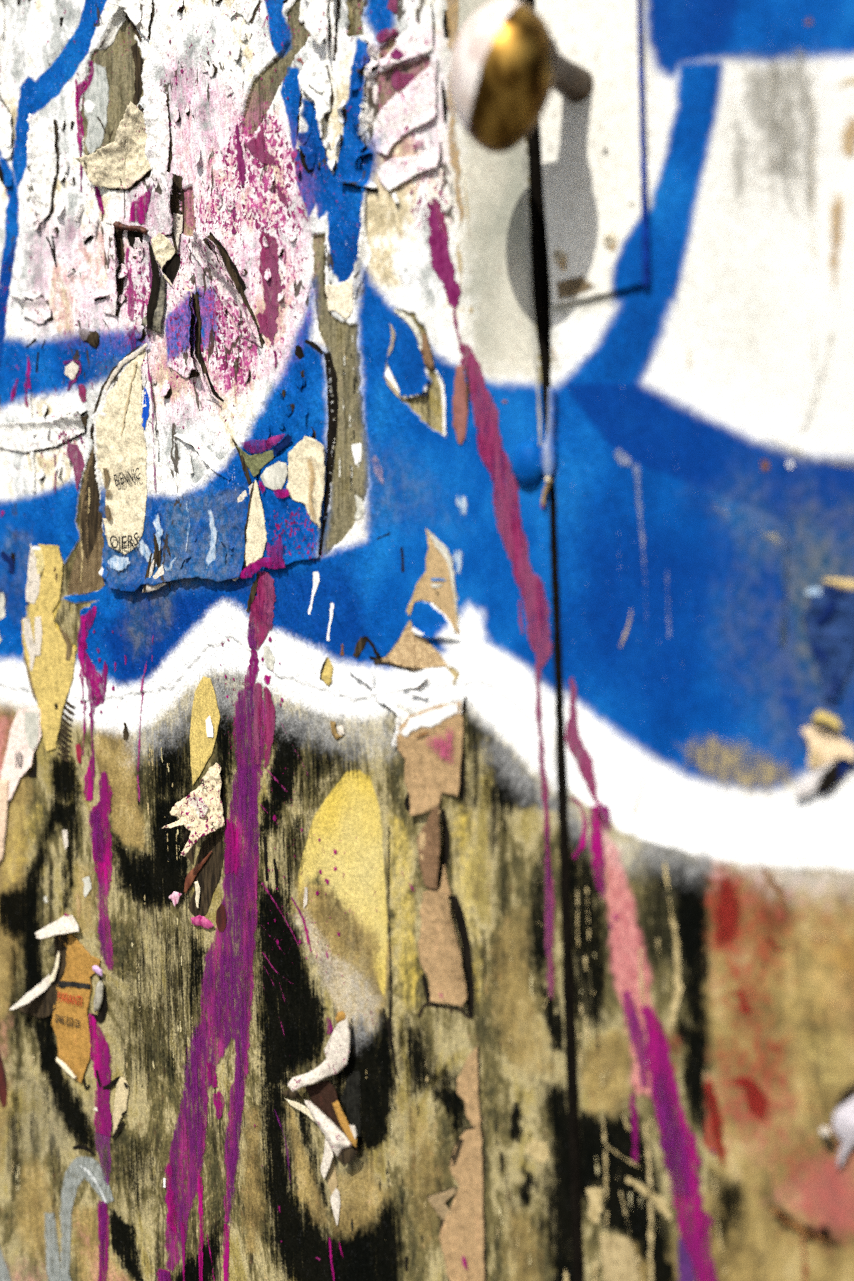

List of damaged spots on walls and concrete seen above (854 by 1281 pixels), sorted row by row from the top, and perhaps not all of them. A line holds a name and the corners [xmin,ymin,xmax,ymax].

peeling [131,43,143,105]
peeling [47,63,109,154]
peeling [116,238,144,279]
peeling [262,232,297,281]
peeling [134,325,147,341]
peeling [160,361,178,399]
peeling [383,309,446,435]
peeling [320,529,460,686]
peeling [83,1070,129,1139]